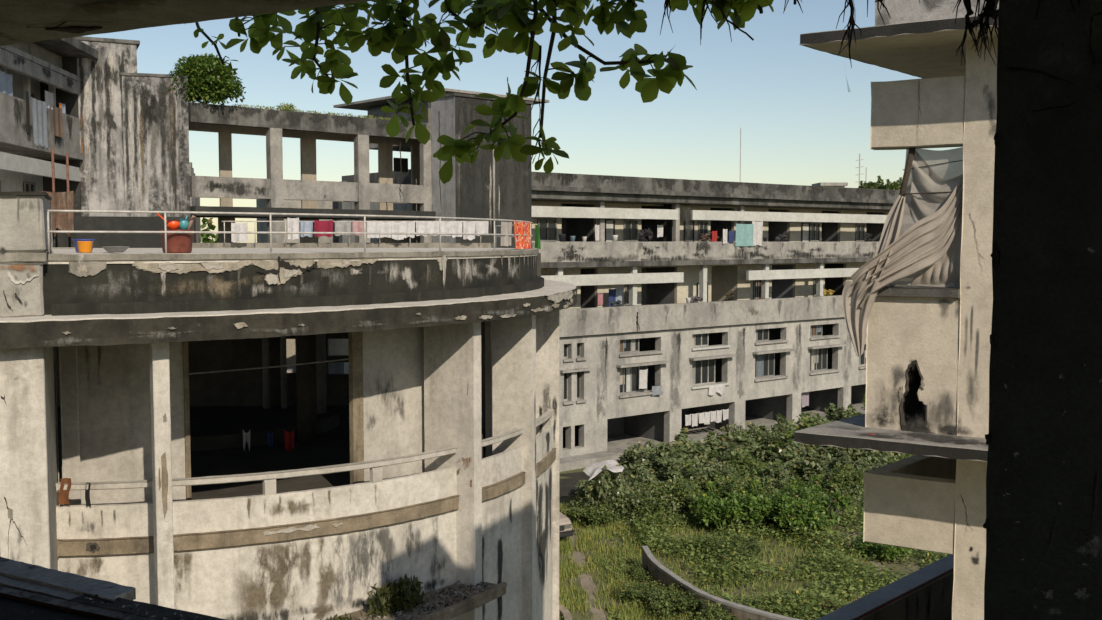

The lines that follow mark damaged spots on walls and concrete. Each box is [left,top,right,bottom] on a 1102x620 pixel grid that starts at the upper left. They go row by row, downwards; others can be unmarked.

damp [14,98,33,134]
damp [55,51,177,216]
flaking render [132,258,378,290]
flaking render [390,267,413,288]
flaking render [457,260,498,278]
spalling [899,365,926,425]
damp [535,387,557,588]
damp [338,530,392,576]
damp [407,525,420,550]
damp [227,539,370,620]
damp [425,559,444,590]